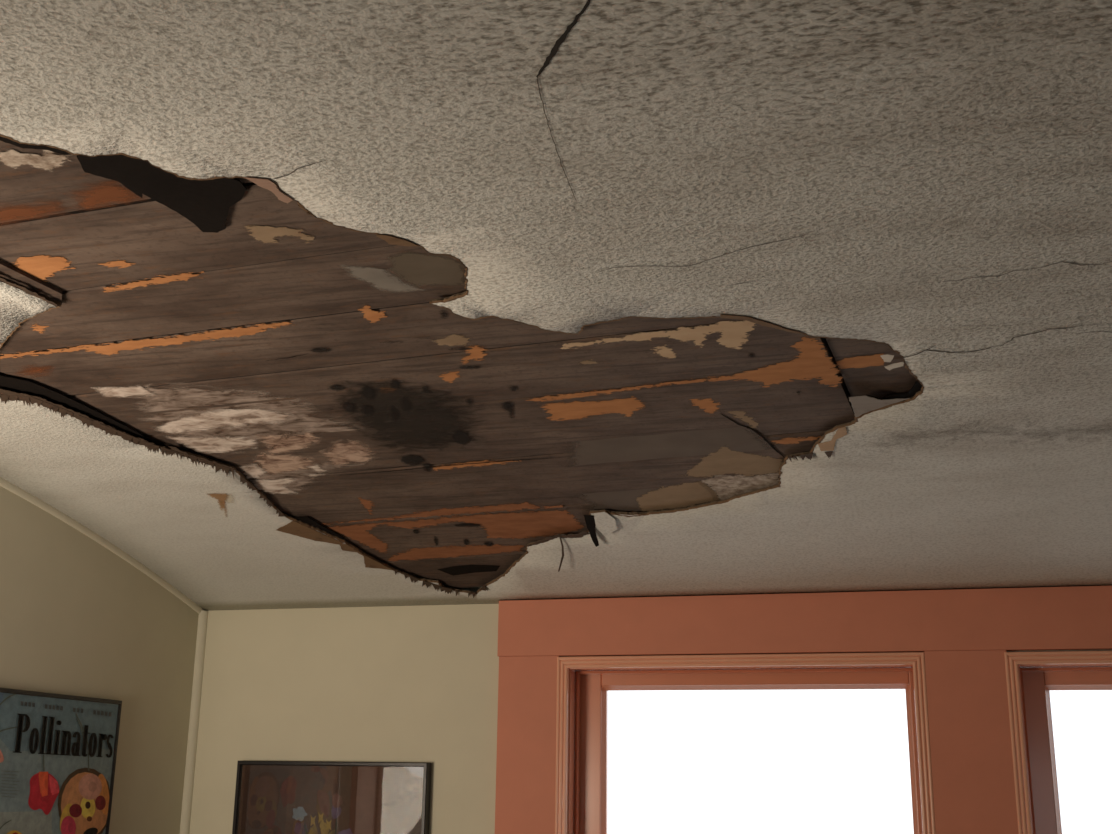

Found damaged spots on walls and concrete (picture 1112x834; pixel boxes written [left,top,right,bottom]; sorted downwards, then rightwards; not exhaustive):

crack [536,0,591,200]
crack [942,261,1112,282]
peeling [0,134,924,598]
crack [902,324,1107,358]
damp [96,380,476,494]